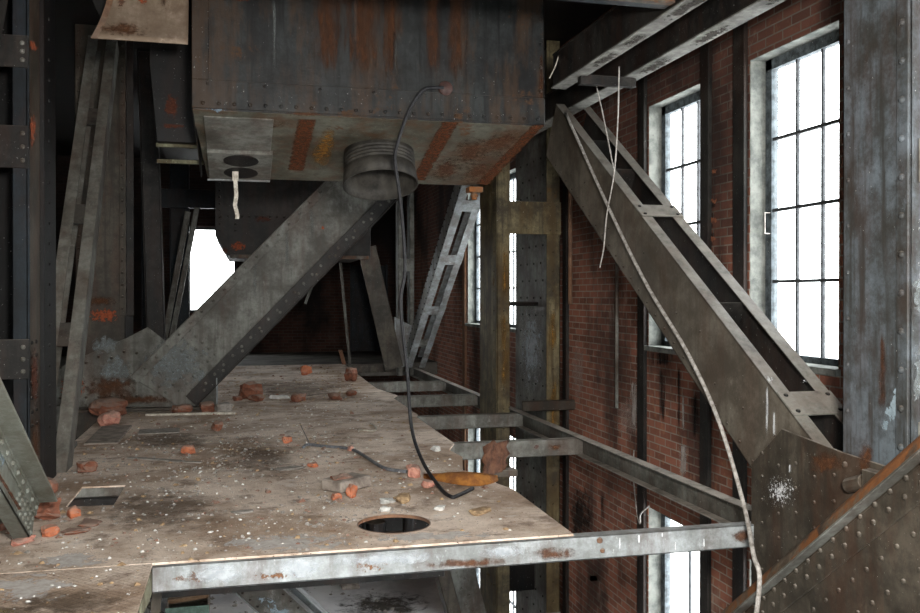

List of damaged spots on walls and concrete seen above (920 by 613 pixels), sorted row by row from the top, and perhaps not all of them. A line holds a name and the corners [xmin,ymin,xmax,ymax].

corrosion [102,23,142,35]
corrosion [288,113,334,171]
corrosion [416,122,544,185]
leakage [765,465,794,507]
leakage [569,487,591,533]
corrosion [429,559,500,567]
corrosion [537,549,571,559]